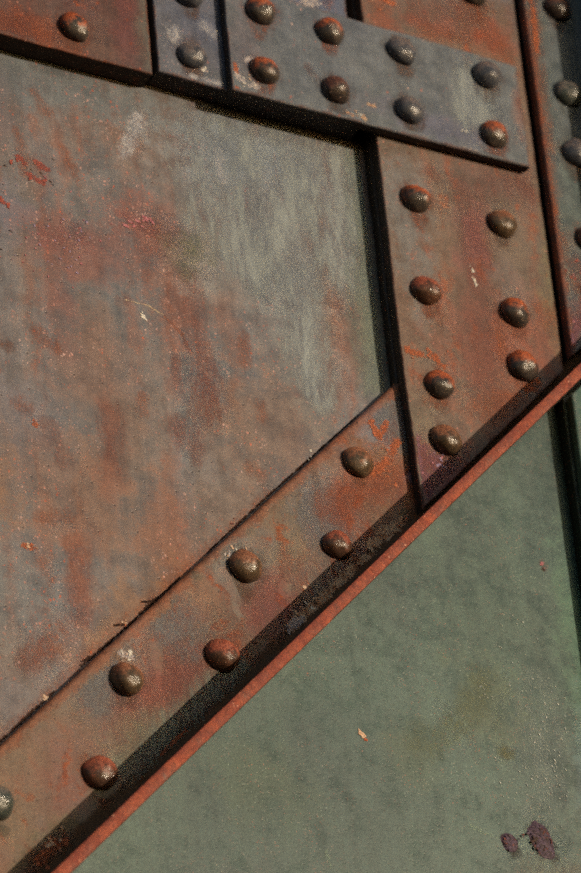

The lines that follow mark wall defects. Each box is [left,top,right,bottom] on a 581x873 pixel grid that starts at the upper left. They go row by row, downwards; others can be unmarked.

peeling [0,154,54,186]
rust [367,417,402,487]
peeling [284,514,408,635]